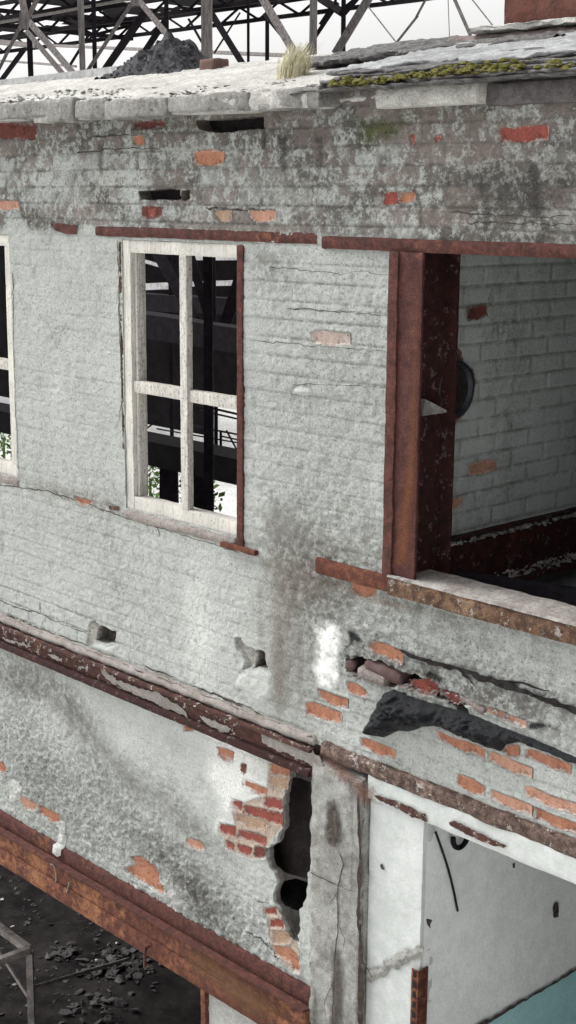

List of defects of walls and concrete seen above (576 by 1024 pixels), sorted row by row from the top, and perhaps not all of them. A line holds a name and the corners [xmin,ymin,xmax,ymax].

spalling [210,117,265,132]
spalling [141,189,182,220]
flaking render [86,621,117,644]
flaking render [100,669,231,733]
flaking render [236,638,259,670]
damp [313,622,342,688]
spalling [305,641,471,723]
spalling [216,731,576,860]
flaking render [125,856,164,893]
spalling [262,906,300,973]
crack [309,794,374,1024]